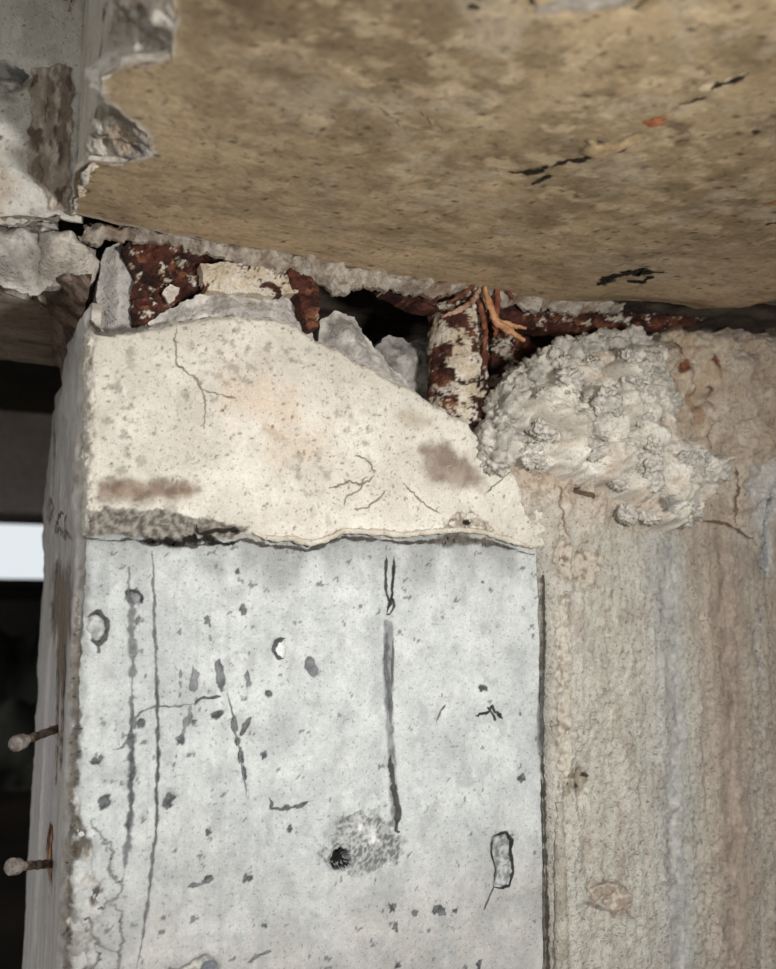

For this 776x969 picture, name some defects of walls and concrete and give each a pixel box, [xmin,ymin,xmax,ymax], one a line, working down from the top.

spalling [0,0,177,232]
crack [510,133,645,185]
rust [200,254,224,264]
peeling [162,284,180,305]
rust [260,282,280,292]
rust [372,289,441,317]
spalling [0,273,92,376]
crack [89,320,151,337]
rust [474,304,736,439]
damp [100,479,193,500]
spalling [87,506,248,541]
crack [52,422,570,969]